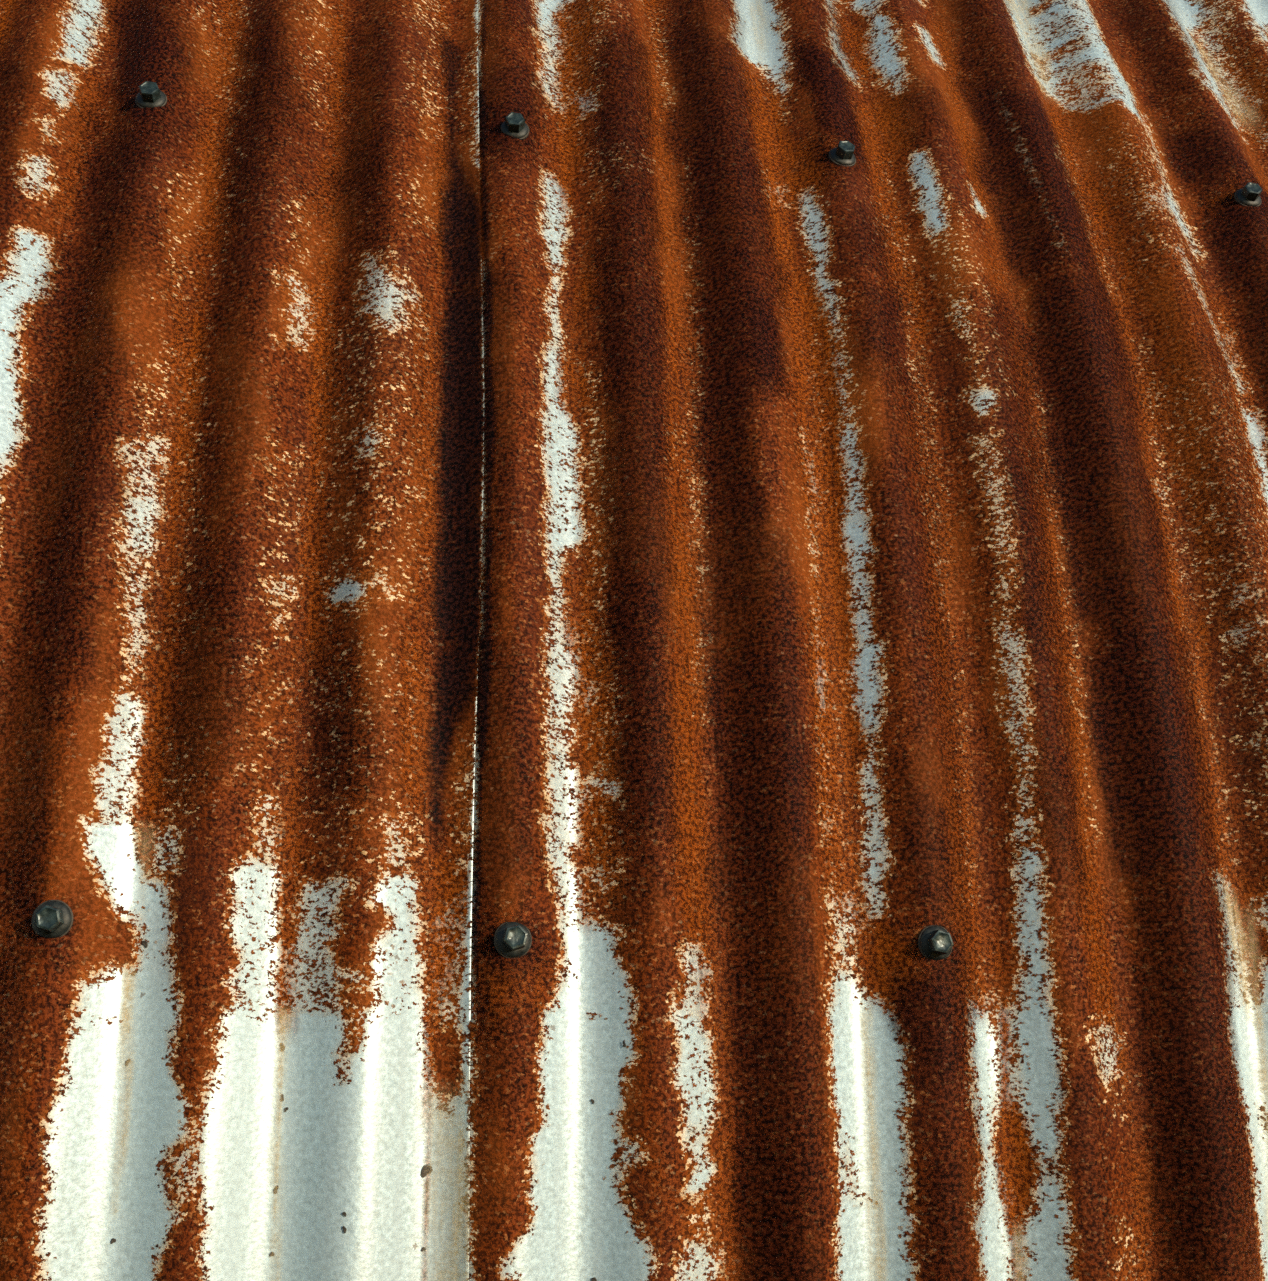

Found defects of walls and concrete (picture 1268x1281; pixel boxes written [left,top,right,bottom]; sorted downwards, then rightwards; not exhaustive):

rust [874,114,901,133]
rust [478,553,486,594]
rust [930,0,1268,1281]
rust [119,975,133,1029]